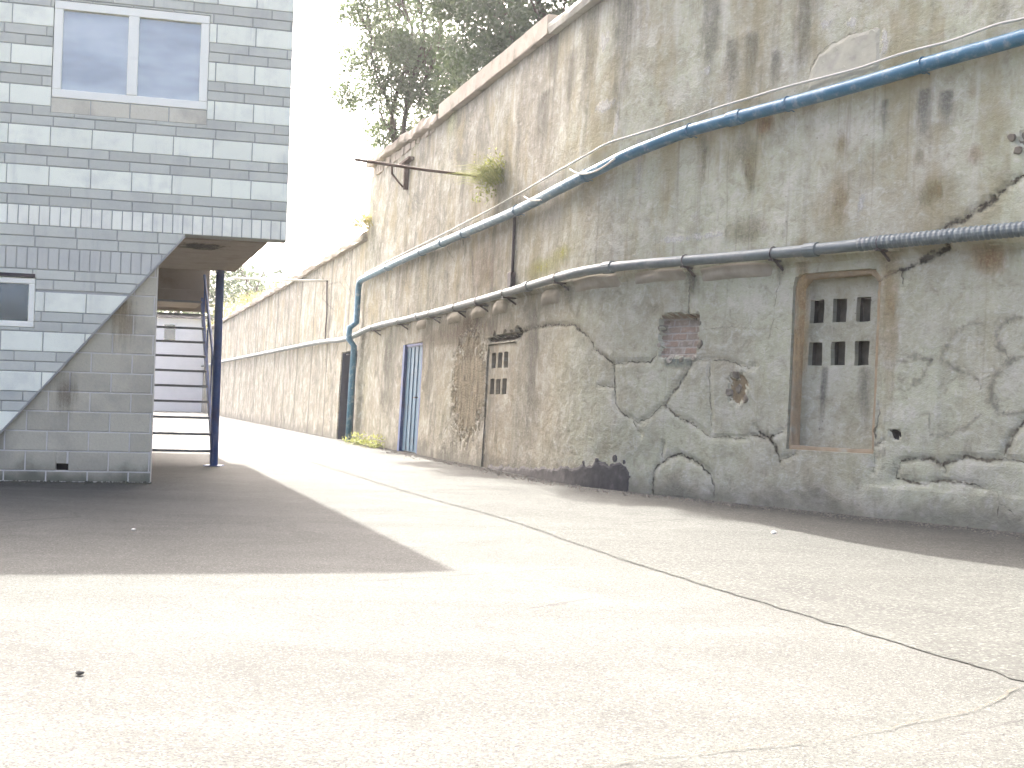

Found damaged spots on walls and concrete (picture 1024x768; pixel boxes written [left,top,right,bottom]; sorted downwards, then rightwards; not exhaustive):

crack [880,175,1024,284]
spalling [657,313,703,364]
crack [524,323,794,462]
spalling [725,371,748,405]
crack [653,446,714,492]
crack [896,422,1024,488]